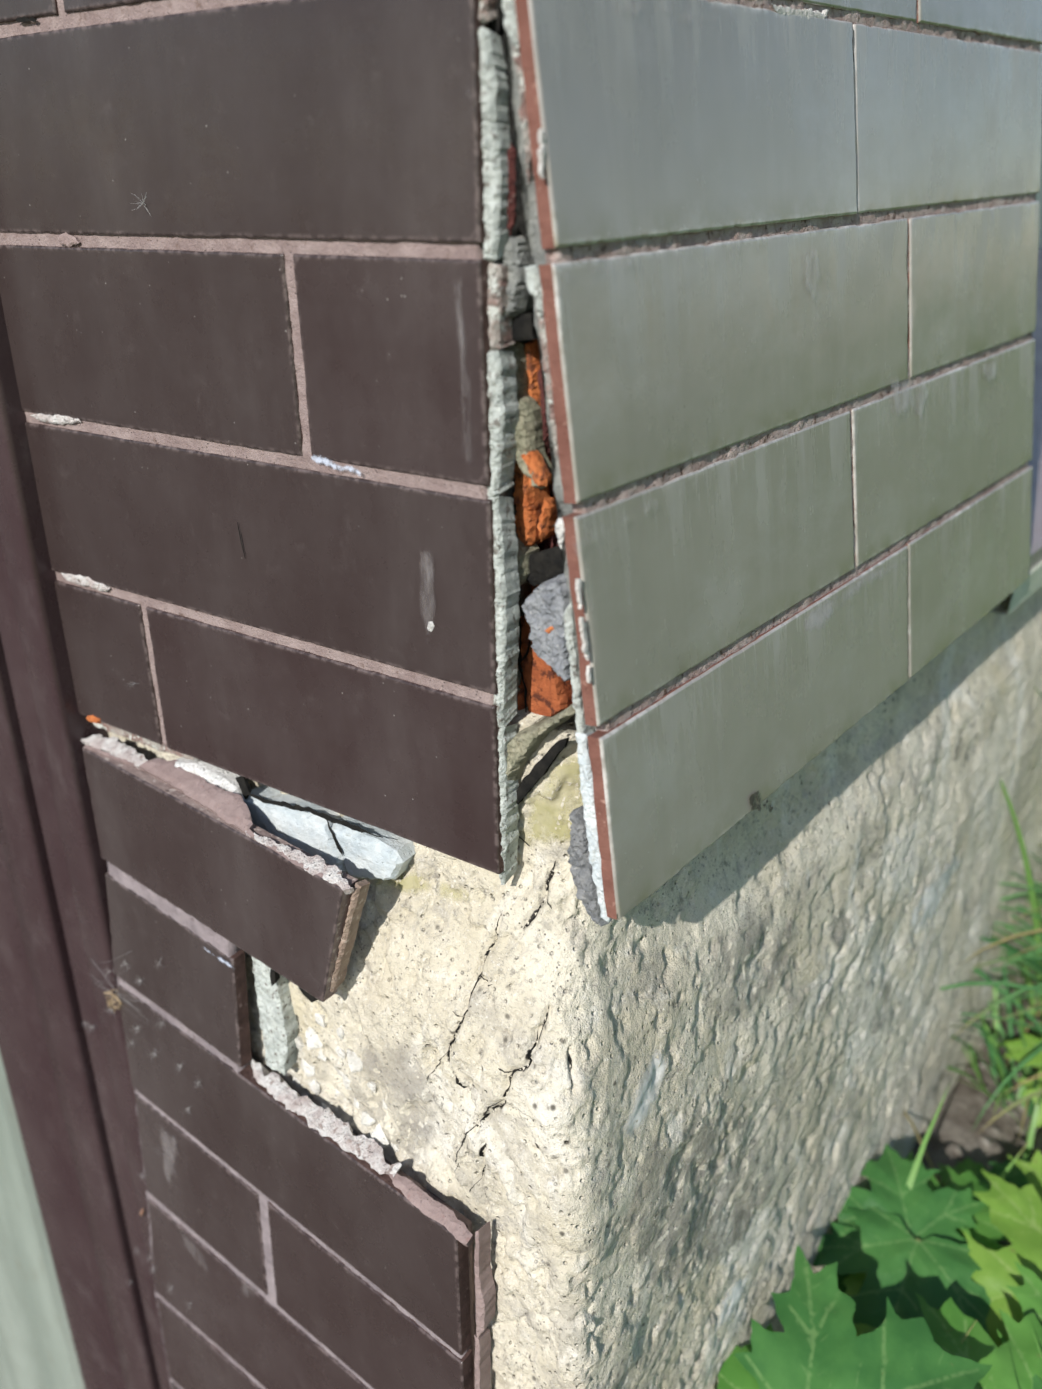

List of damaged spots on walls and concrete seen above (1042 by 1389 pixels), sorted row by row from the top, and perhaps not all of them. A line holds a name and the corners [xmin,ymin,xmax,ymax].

crack [490,0,527,241]
peeling [537,128,546,179]
crack [512,312,538,341]
crack [518,546,564,713]
peeling [575,578,592,683]
crack [426,737,572,1198]
flaking render [285,1013,400,1154]